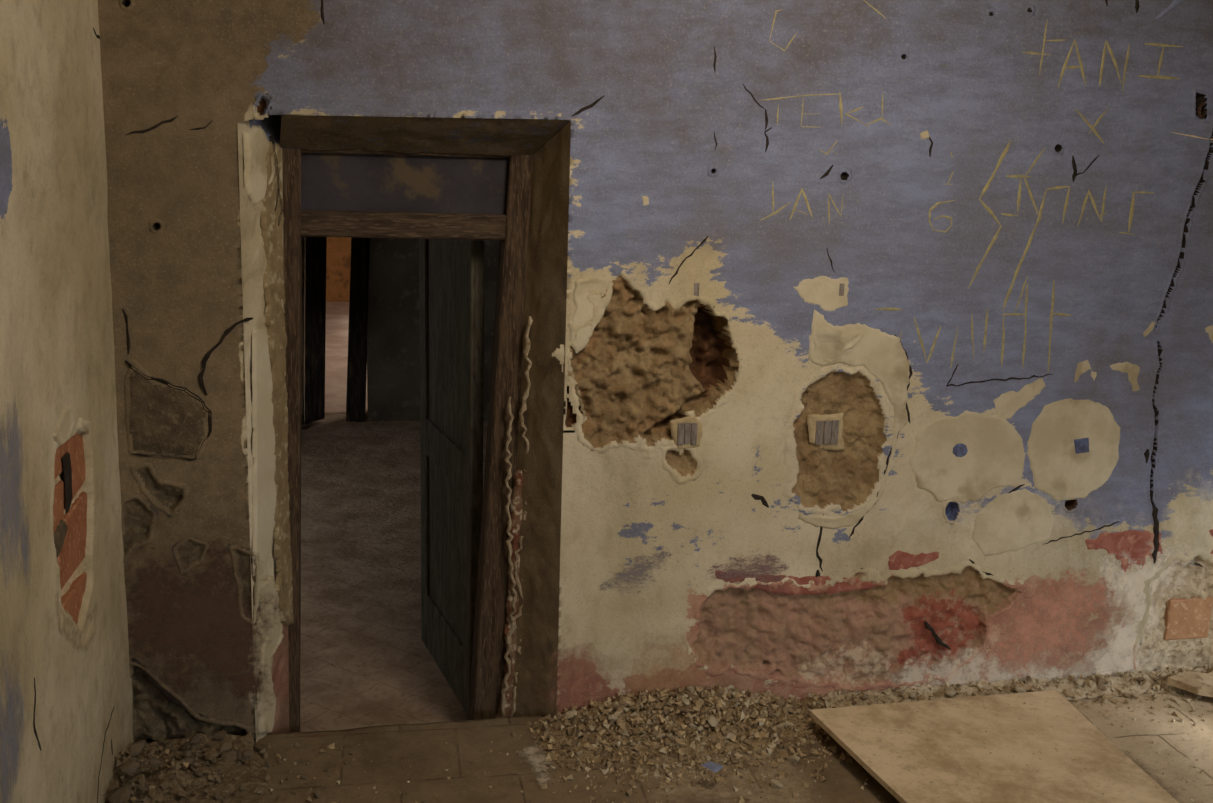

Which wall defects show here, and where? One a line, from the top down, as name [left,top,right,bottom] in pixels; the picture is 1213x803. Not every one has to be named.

crack [743,84,772,153]
crack [1072,155,1099,182]
crack [122,309,253,461]
spalling [121,92,294,743]
spalling [552,267,748,485]
spalling [782,276,910,529]
crack [1144,122,1213,567]
spalling [50,404,97,650]
spalling [684,551,1036,692]
crack [1045,521,1120,544]
spalling [1085,529,1213,674]
crack [33,678,41,751]